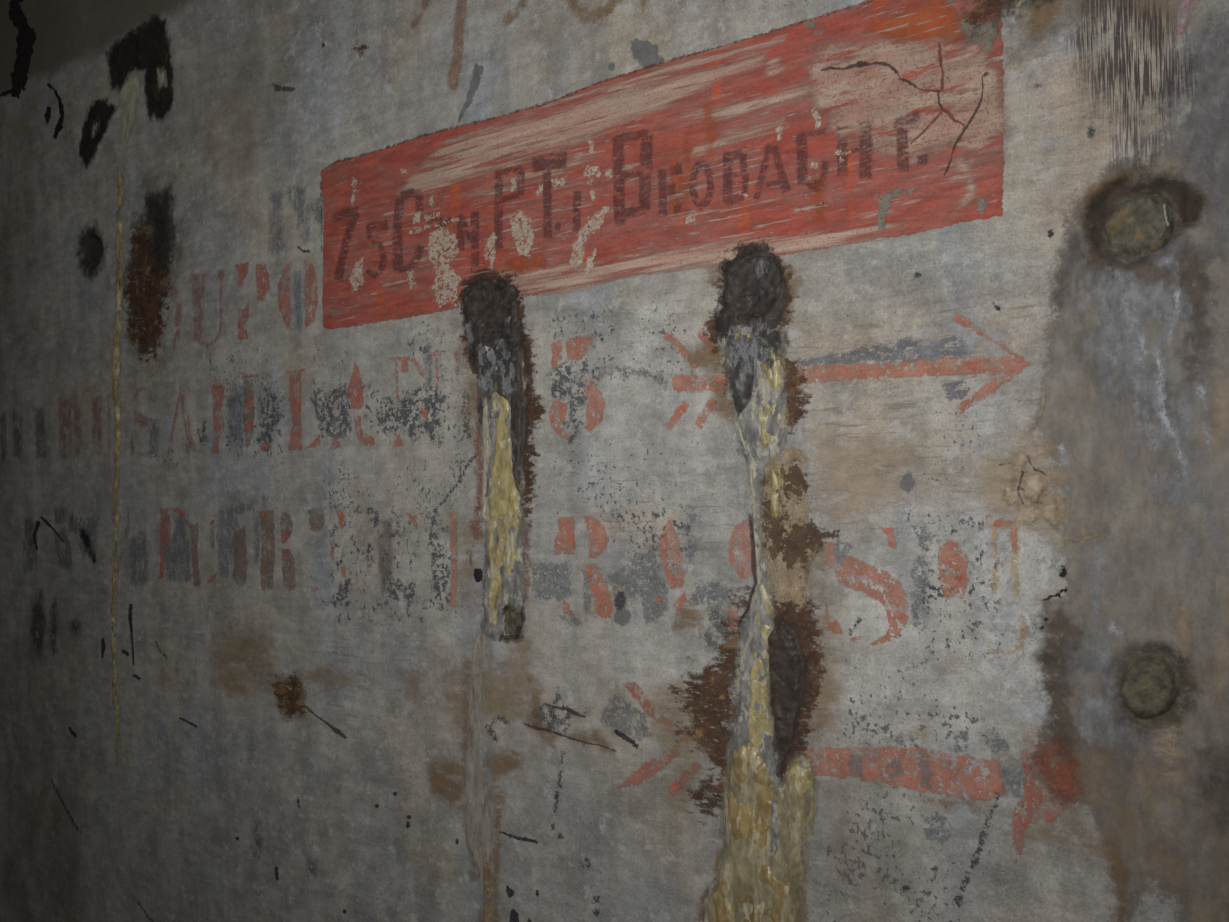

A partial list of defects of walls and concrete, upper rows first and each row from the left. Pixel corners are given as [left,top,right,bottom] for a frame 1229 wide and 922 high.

crack [0,0,64,139]
crack [821,43,988,175]
rust [123,220,171,362]
damp [79,16,173,765]
damp [473,429,483,538]
damp [1029,0,1229,922]
rust [272,675,346,739]
damp [769,601,832,783]